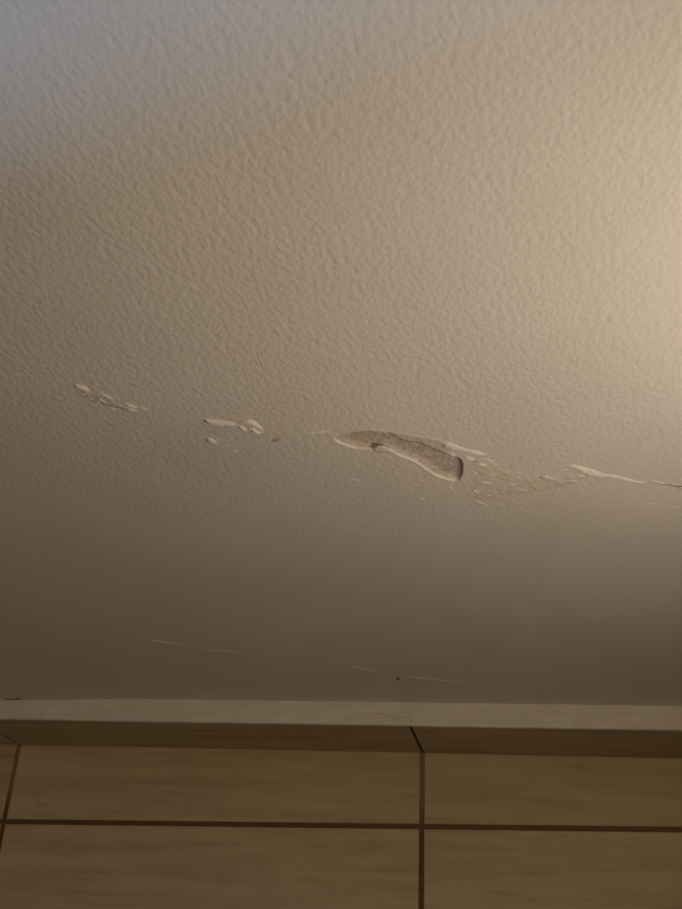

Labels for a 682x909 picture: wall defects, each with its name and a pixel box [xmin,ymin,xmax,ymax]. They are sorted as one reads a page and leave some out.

peeling [203,418,283,443]
flaking render [334,429,494,506]
peeling [539,465,649,484]